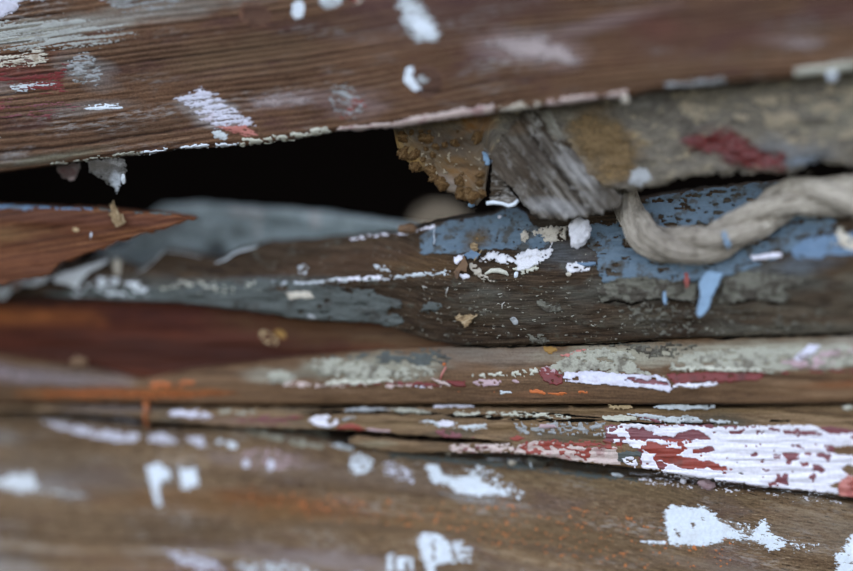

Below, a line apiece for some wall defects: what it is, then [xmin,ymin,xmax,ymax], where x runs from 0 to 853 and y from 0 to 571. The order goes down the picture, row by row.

peeling [291,0,305,20]
peeling [395,0,442,43]
peeling [0,0,184,119]
peeling [403,66,429,92]
peeling [629,168,654,188]
peeling [643,182,778,227]
peeling [0,203,568,327]
peeling [267,215,853,395]
peeling [42,416,177,444]
peeling [168,409,257,420]
peeling [217,404,853,504]
peeling [146,462,199,506]